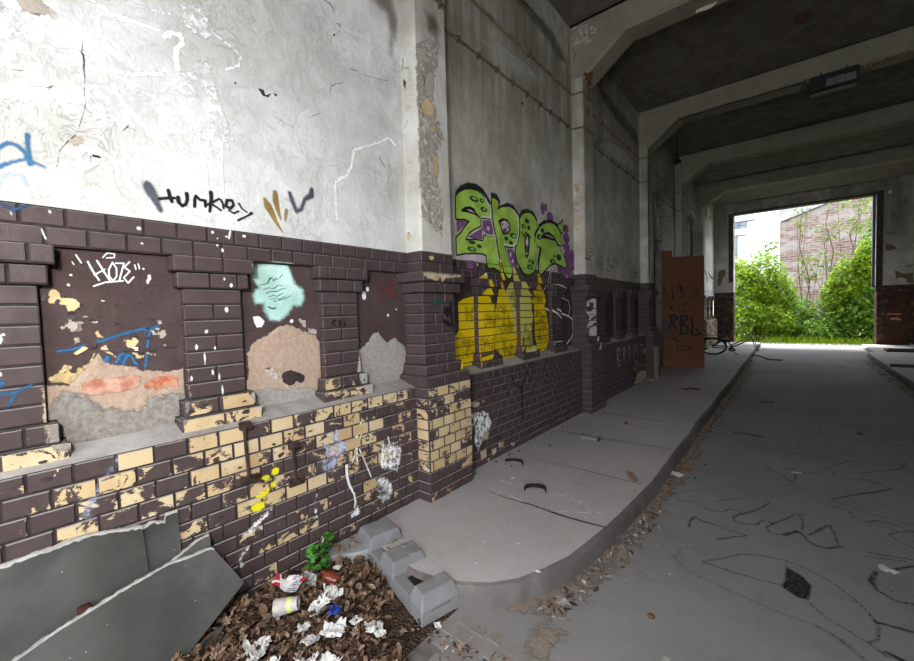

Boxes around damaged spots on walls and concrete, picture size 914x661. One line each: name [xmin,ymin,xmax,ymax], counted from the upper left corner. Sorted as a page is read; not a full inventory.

flaking render [402,38,445,238]
flaking render [0,289,515,661]